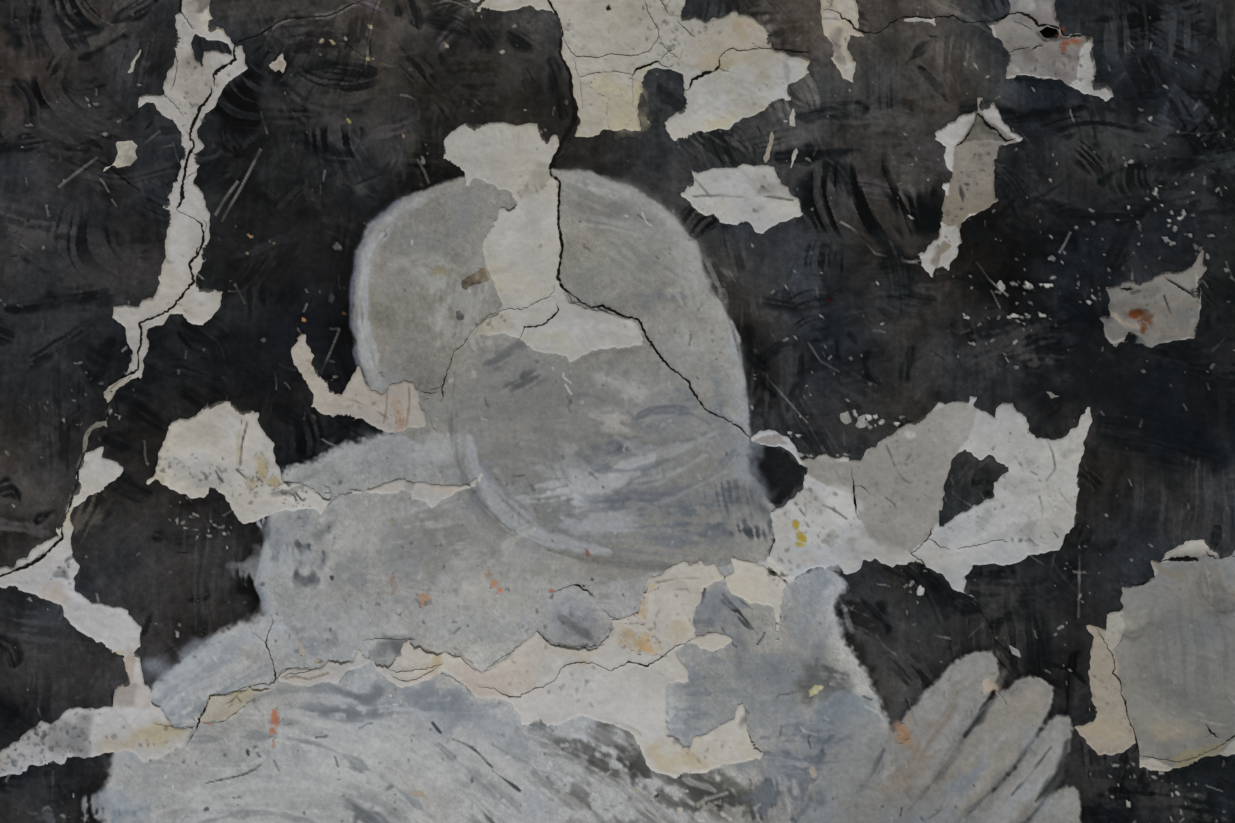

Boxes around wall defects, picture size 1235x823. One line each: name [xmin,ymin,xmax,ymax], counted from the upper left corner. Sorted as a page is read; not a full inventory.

peeling [103,0,248,403]
crack [0,0,376,577]
peeling [441,121,644,362]
crack [422,0,811,436]
peeling [471,0,810,145]
peeling [681,132,804,234]
crack [158,616,317,746]
crack [392,632,694,697]
peeling [0,396,1092,778]
crack [552,584,617,619]
peeling [1075,539,1235,771]
crack [1136,551,1235,586]